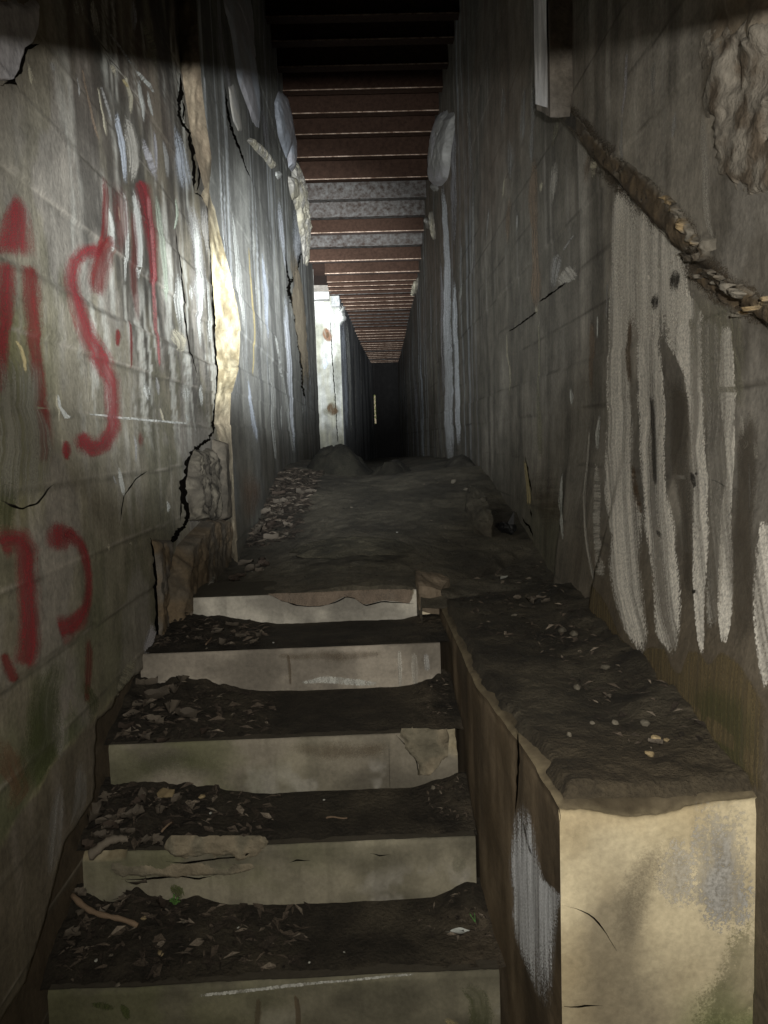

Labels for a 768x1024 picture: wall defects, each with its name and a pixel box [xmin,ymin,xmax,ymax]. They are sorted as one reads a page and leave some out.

crack [1,44,39,86]
spalling [699,19,768,195]
crack [150,74,219,635]
crack [509,272,577,331]
spalling [559,105,768,327]
spalling [152,439,233,636]
water stain [583,186,768,792]
spalling [111,835,268,880]
spalling [400,728,449,776]
crack [513,737,521,815]
water stain [511,813,560,996]
crack [567,906,614,946]